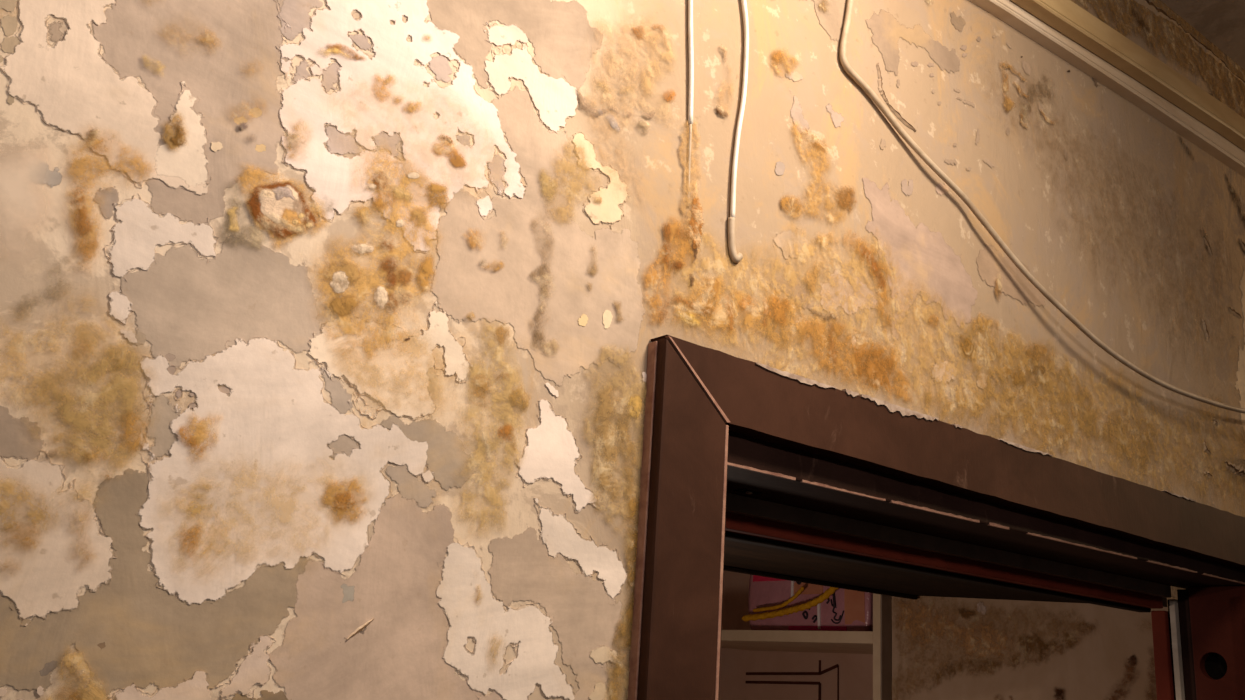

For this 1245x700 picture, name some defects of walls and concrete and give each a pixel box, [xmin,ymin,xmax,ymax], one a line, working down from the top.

flaking render [866,9,1031,105]
peeling [0,0,646,700]
water stain [586,346,646,700]
water stain [674,233,1245,507]